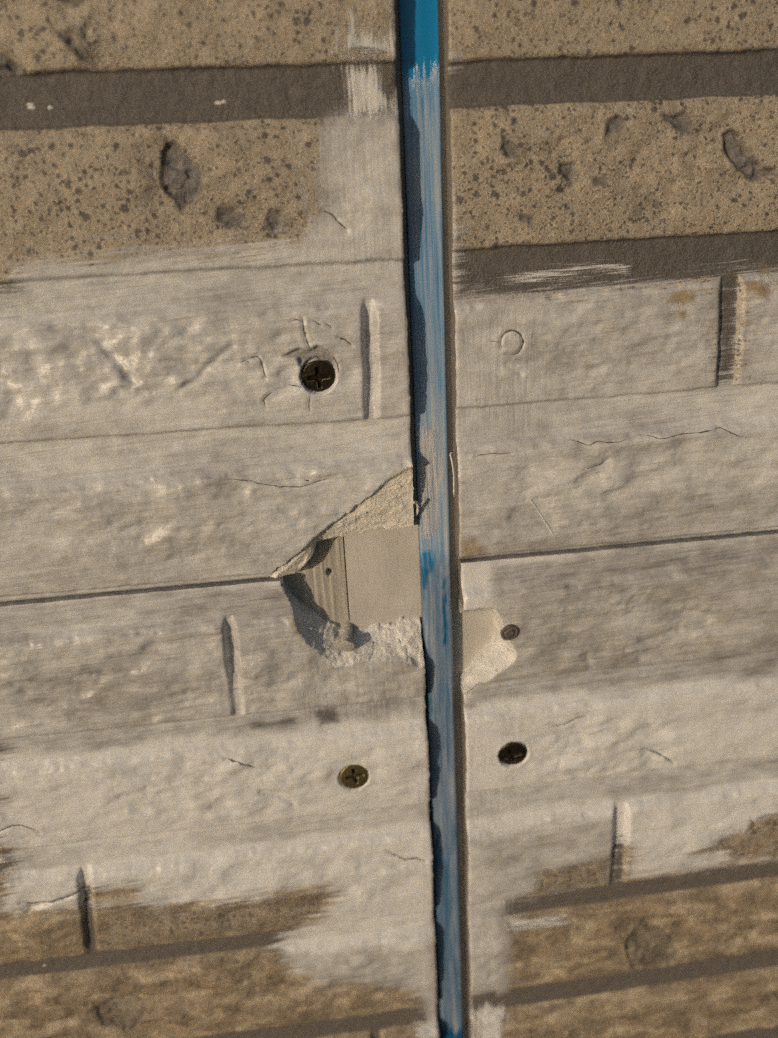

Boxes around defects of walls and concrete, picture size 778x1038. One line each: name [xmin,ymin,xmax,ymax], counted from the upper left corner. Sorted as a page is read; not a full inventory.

spalling [267,465,424,669]
spalling [458,599,518,696]